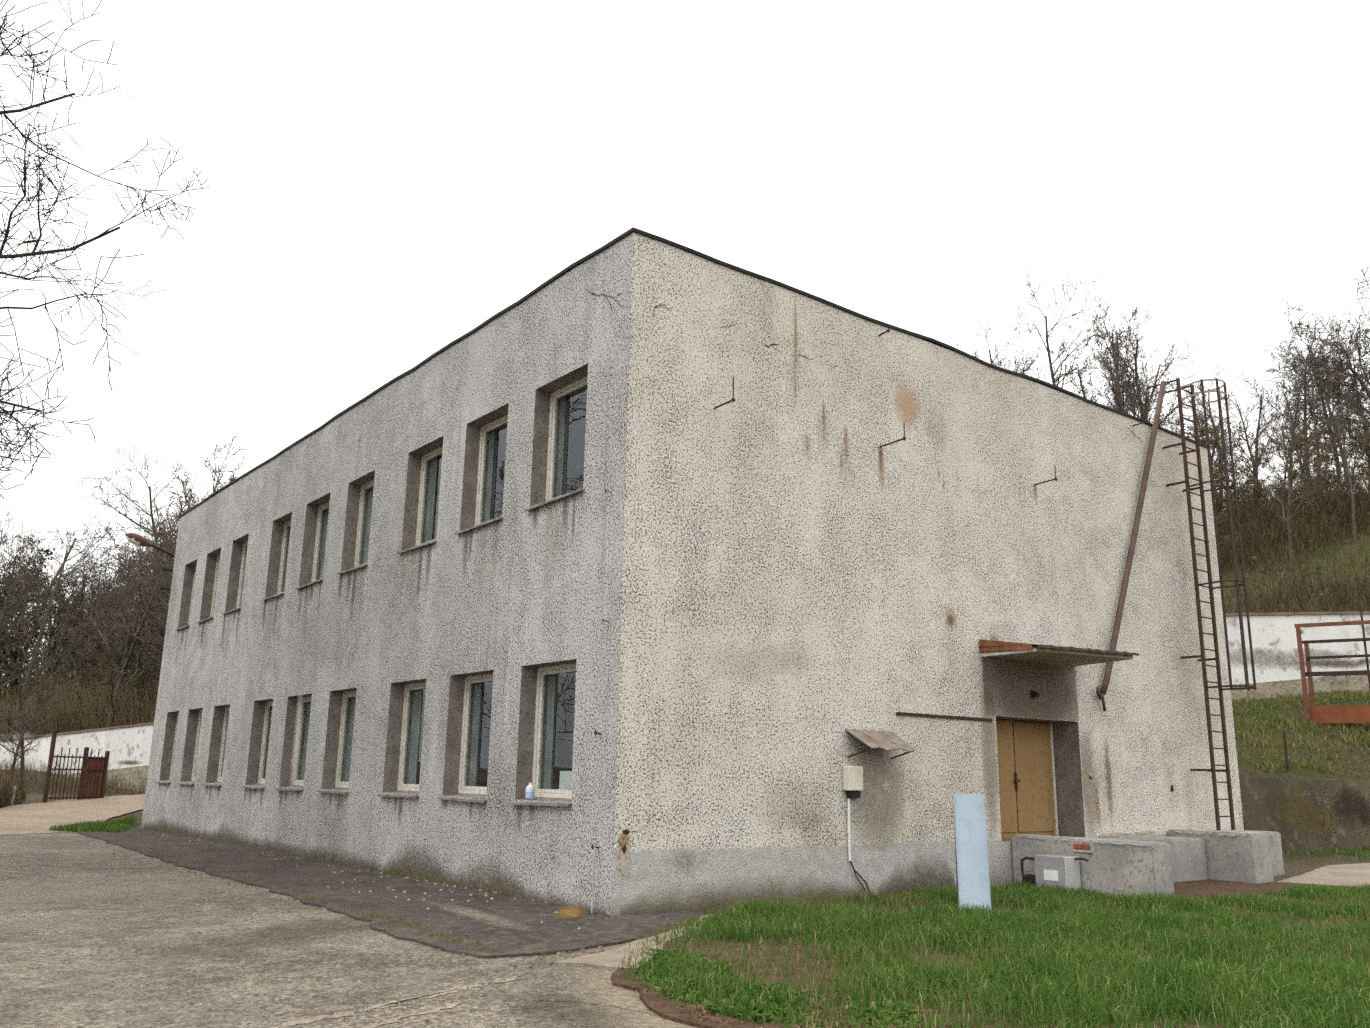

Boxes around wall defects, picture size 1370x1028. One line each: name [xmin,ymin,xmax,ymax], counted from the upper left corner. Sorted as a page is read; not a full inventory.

crack [582,286,672,315]